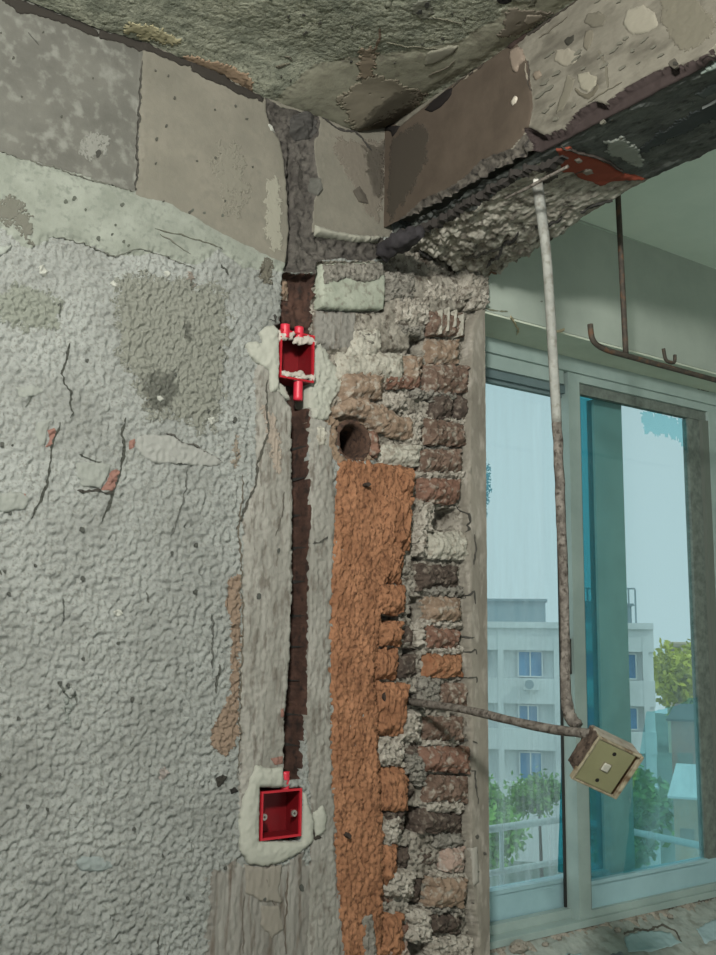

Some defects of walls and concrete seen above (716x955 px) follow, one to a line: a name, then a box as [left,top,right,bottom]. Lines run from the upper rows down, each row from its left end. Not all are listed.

crack [0,0,264,192]
peeling [509,47,525,72]
spalling [524,0,716,186]
spalling [0,194,35,247]
crack [31,343,74,519]
crack [77,418,126,521]
crack [164,433,221,537]
crack [275,477,328,550]
crack [210,380,270,778]
peeling [467,835,487,885]
peeling [610,931,682,955]